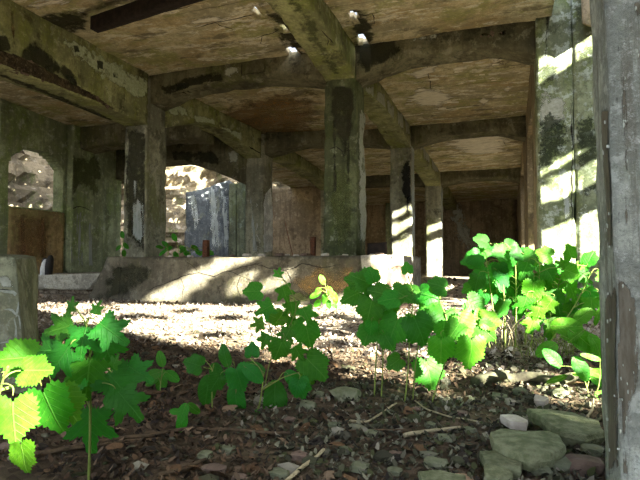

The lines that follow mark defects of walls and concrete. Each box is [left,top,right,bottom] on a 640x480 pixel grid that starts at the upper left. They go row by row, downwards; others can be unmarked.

leakage [347,10,400,72]
leakage [22,42,77,86]
leakage [160,67,238,94]
leakage [331,86,367,242]
leakage [97,263,151,299]
crack [150,262,340,297]
peeling [605,281,640,473]